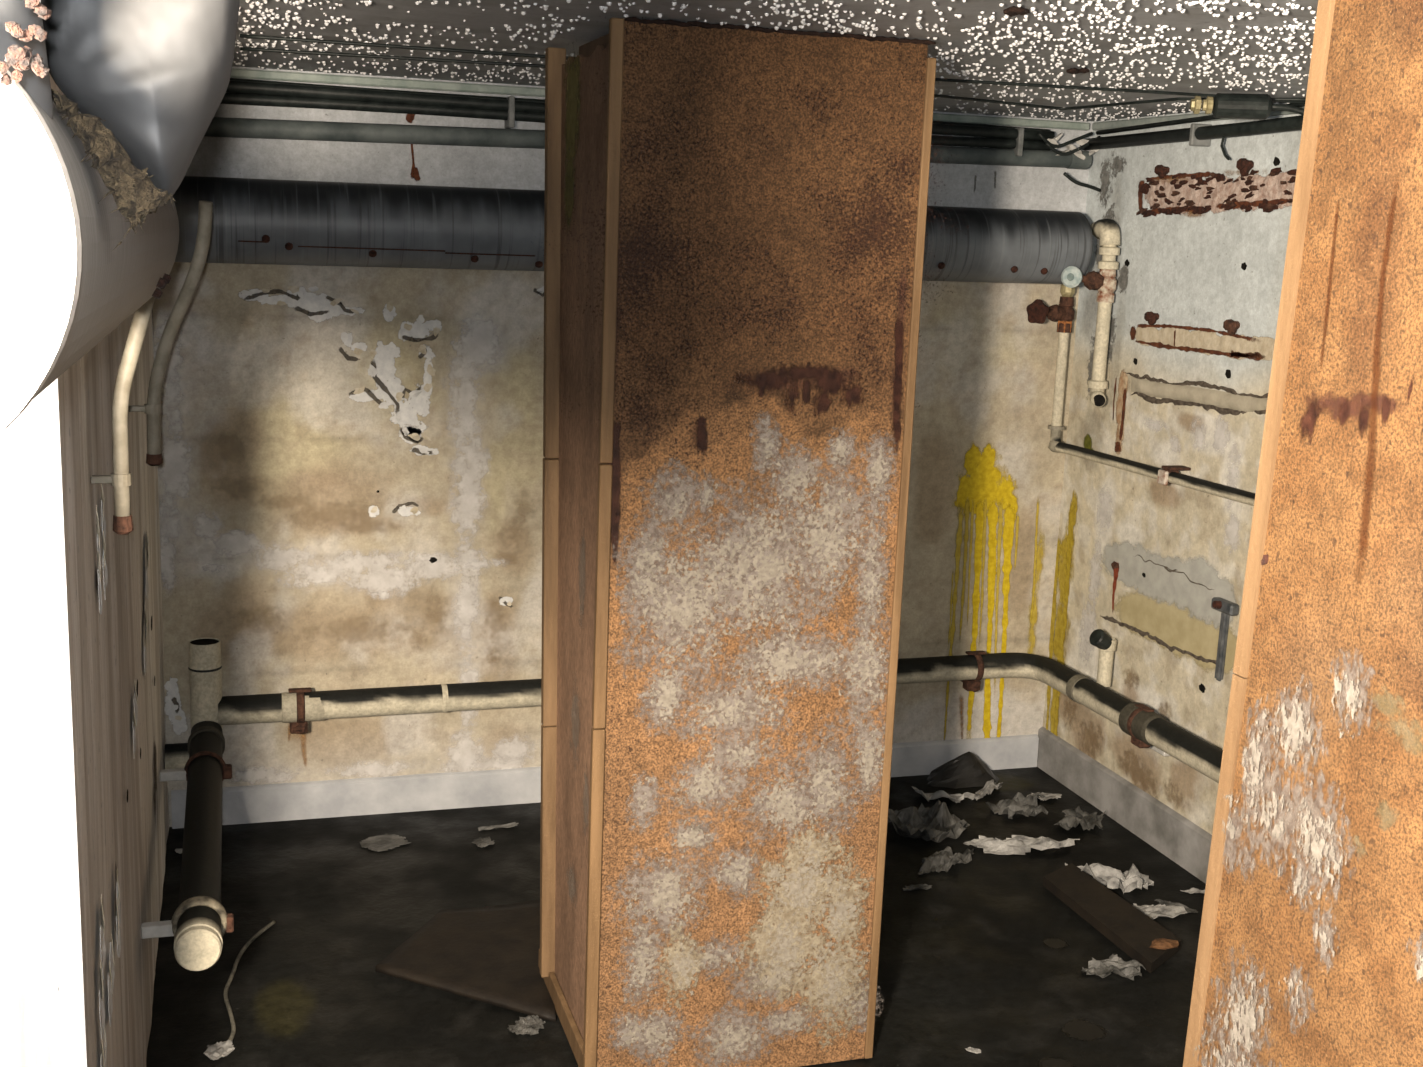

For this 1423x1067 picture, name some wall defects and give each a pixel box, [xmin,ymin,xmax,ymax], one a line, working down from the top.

rust [1321,207,1338,361]
peeling [238,286,442,456]
rust [1360,198,1395,554]
water stain [153,314,501,639]
water stain [567,17,968,1066]
water stain [461,657,478,683]
water stain [443,710,528,772]
water stain [1331,667,1363,738]
water stain [1222,684,1347,973]
water stain [1193,961,1307,1067]